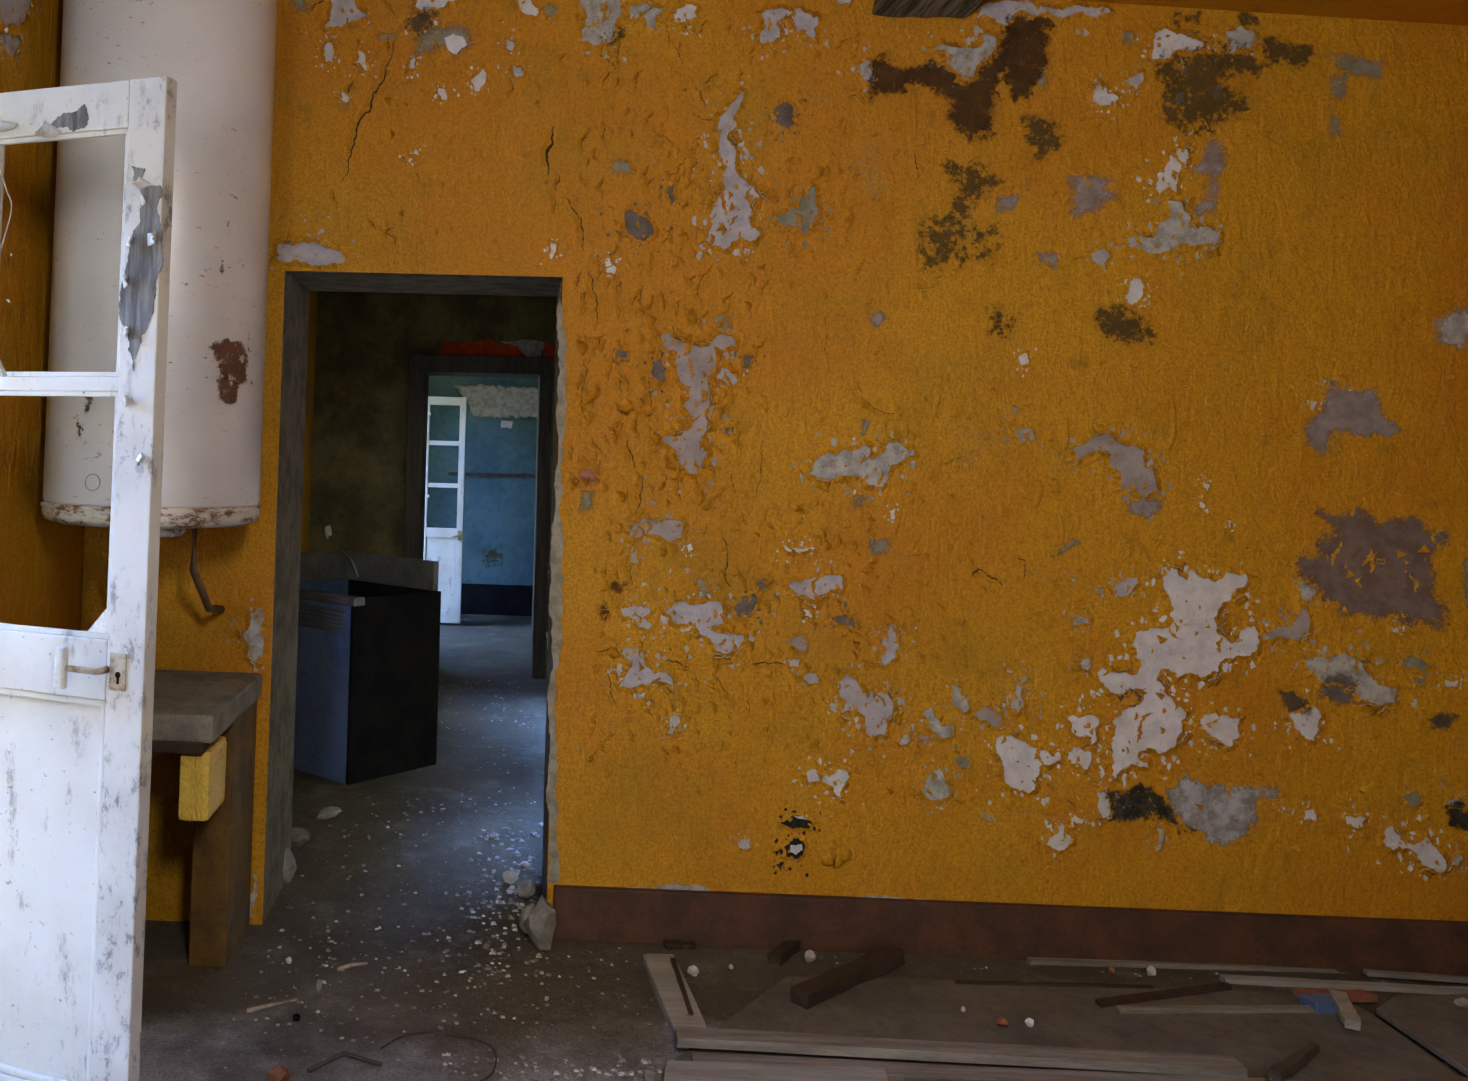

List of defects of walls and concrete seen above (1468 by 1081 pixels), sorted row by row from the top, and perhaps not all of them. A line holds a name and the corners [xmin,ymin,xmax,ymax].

peeling [0,104,89,139]
crack [330,0,405,248]
peeling [594,76,835,278]
water stain [866,14,1065,161]
water stain [918,159,1018,270]
water stain [1149,10,1313,136]
water stain [986,305,1015,338]
peeling [604,309,766,494]
peeling [791,427,921,524]
peeling [1001,402,1174,523]
peeling [1304,375,1401,456]
peeling [607,499,1468,881]